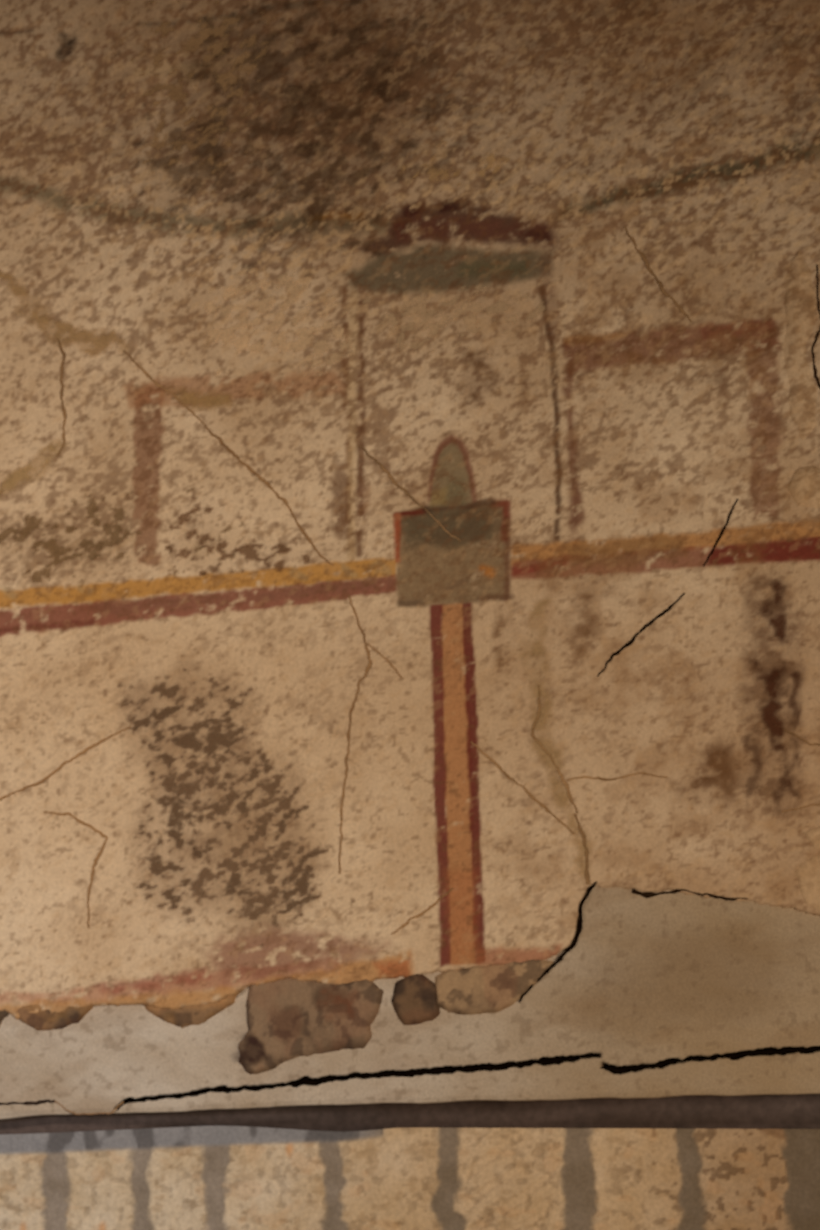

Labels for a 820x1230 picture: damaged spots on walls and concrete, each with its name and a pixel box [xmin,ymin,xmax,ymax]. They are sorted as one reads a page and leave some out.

crack [812,264,820,388]
crack [703,499,738,566]
crack [598,593,685,676]
leakage [764,582,786,639]
leakage [756,664,799,749]
leakage [121,677,328,924]
flaking render [0,1004,93,1031]
flaking render [144,959,555,1074]
crack [0,1046,820,1115]